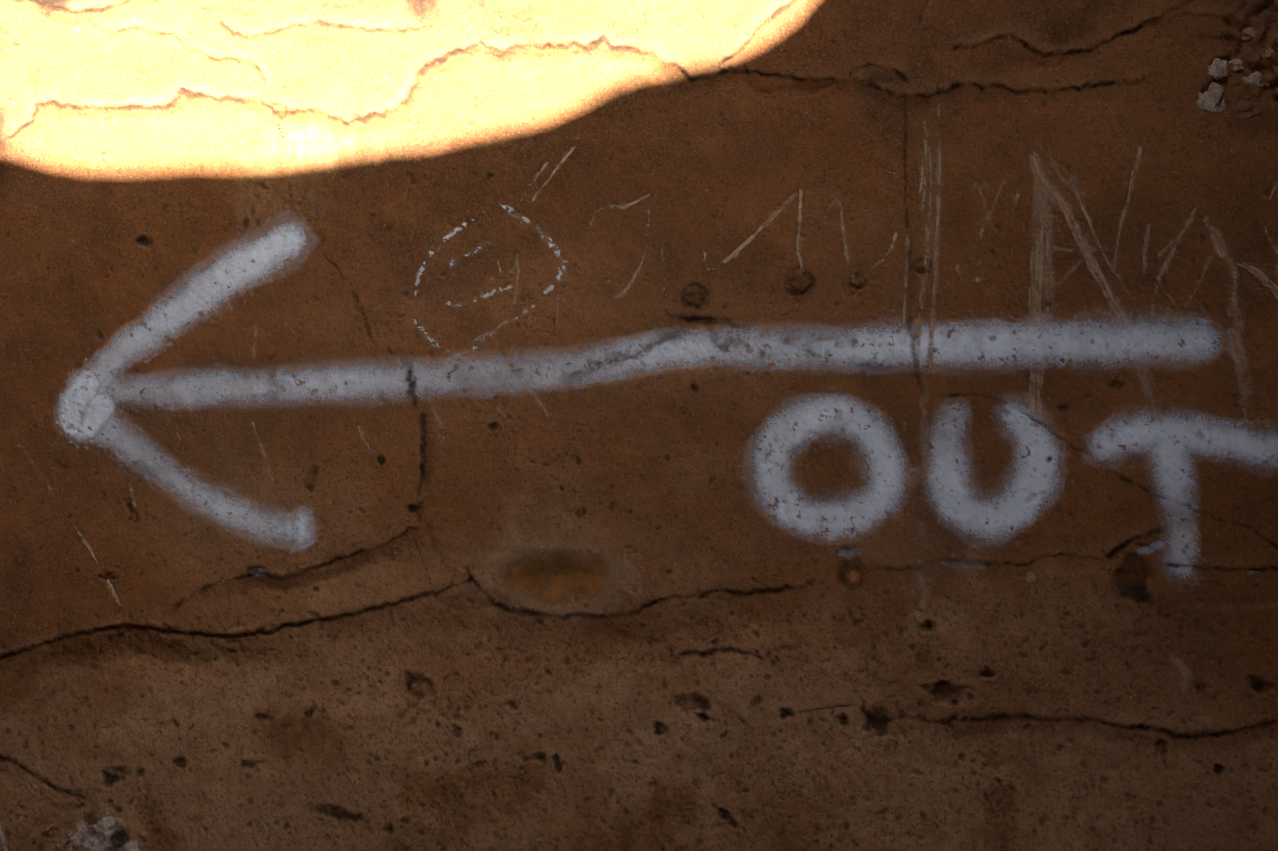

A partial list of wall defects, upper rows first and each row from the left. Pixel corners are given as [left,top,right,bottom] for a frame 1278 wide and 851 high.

crack [16,0,120,32]
crack [771,4,790,18]
spalling [1196,0,1278,121]
crack [9,101,78,137]
crack [112,87,294,117]
crack [329,43,484,125]
crack [540,36,1115,167]
crack [612,315,764,362]
crack [328,260,426,539]
crack [467,573,663,619]
crack [1105,721,1270,738]
spalling [64,811,144,851]